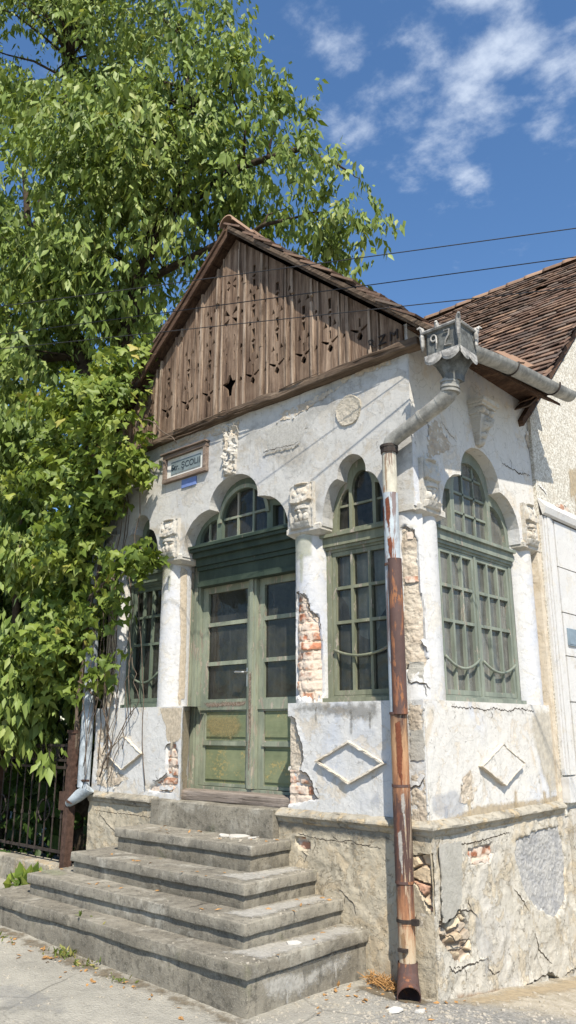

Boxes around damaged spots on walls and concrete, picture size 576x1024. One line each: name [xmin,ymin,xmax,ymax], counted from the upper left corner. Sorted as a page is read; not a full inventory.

peeling [151,567,194,792]
flaking render [295,592,322,702]
flaking render [400,526,427,670]
flaking render [288,719,318,804]
rust [395,721,403,785]
crack [298,833,382,862]
flaking render [413,854,471,962]
flaking render [467,844,492,864]